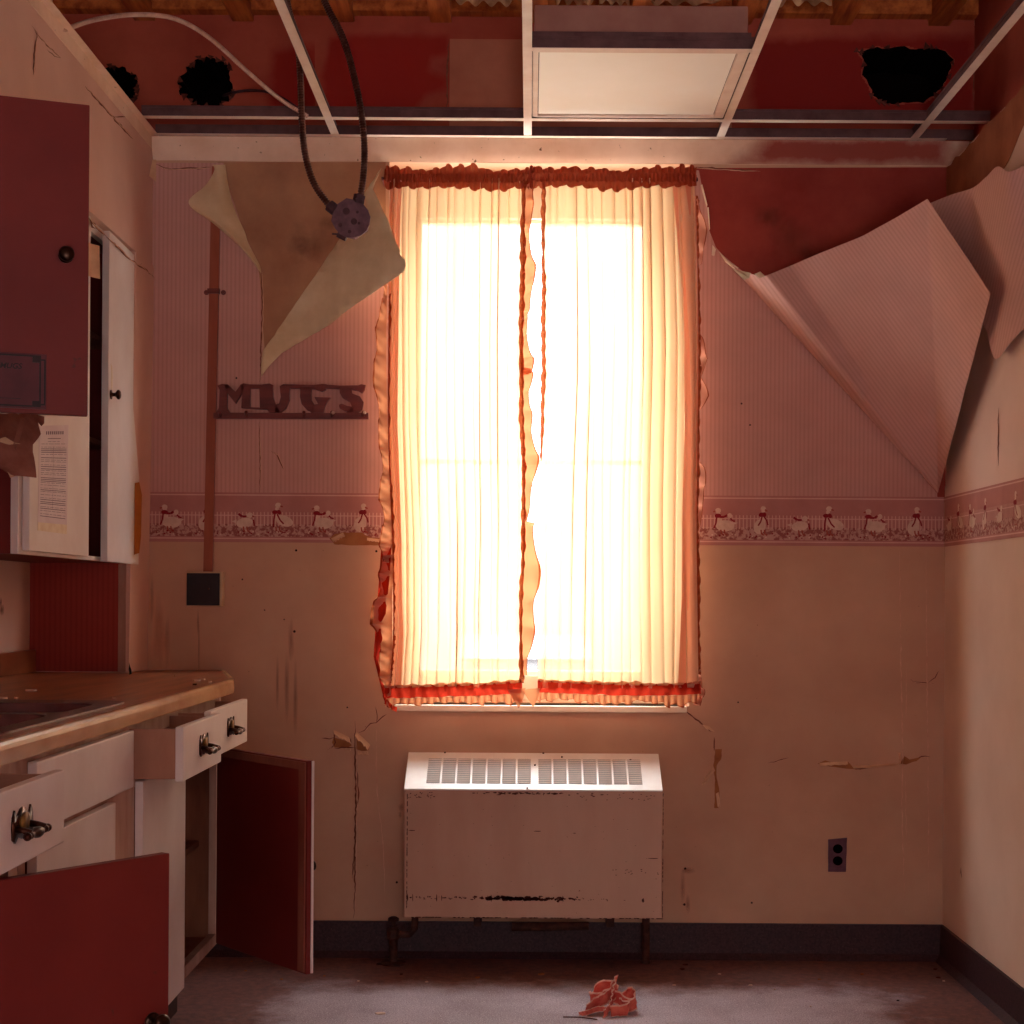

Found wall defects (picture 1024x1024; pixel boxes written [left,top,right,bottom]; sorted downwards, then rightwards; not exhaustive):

hole [105,63,140,103]
hole [177,55,235,106]
hole [854,42,954,107]
flaking render [218,162,386,347]
flaking render [697,85,1024,276]
crack [352,710,387,918]